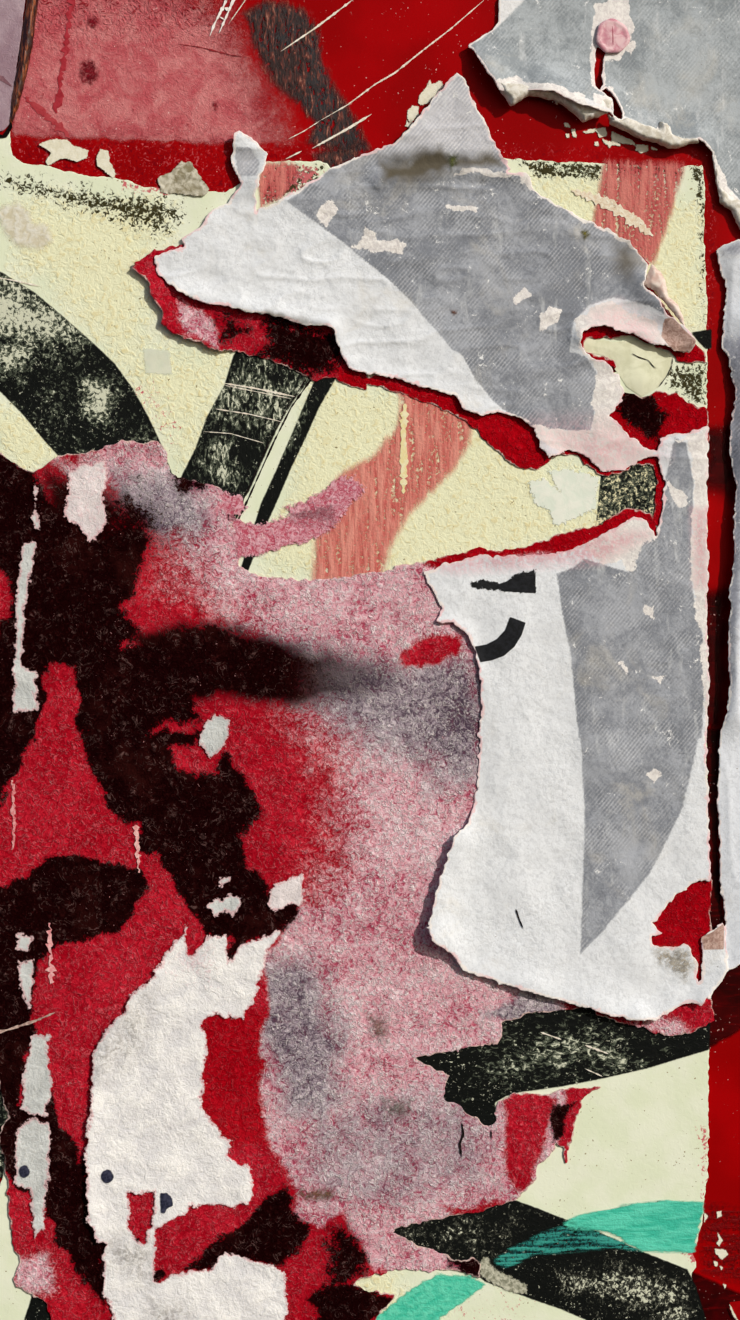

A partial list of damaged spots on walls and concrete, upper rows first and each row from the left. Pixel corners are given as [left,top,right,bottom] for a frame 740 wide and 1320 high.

peeling [564,123,658,153]
peeling [158,161,209,196]